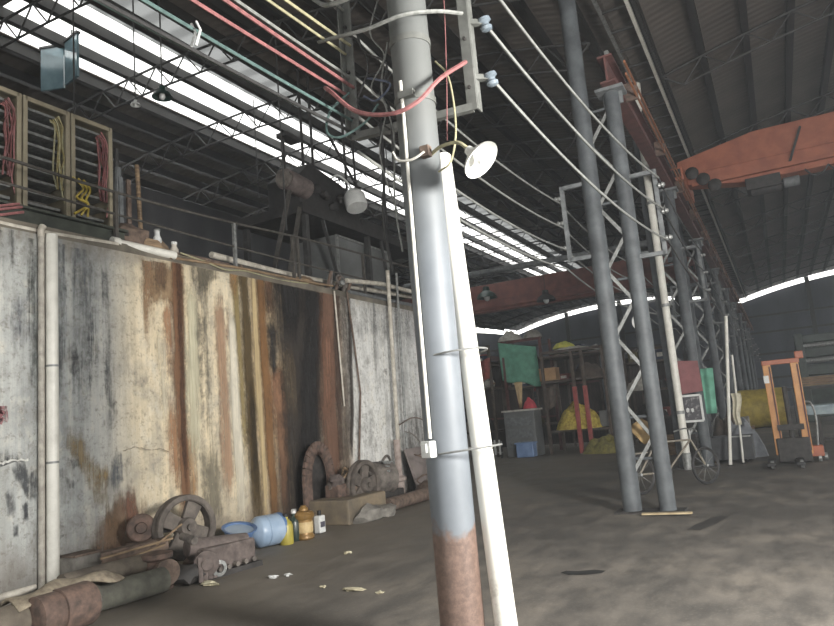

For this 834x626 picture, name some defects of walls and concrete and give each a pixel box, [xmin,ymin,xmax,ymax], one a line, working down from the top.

crack [0,457,29,465]
damp [17,238,37,382]
corrosion [143,260,197,508]
corrosion [215,274,287,516]
damp [266,283,325,519]